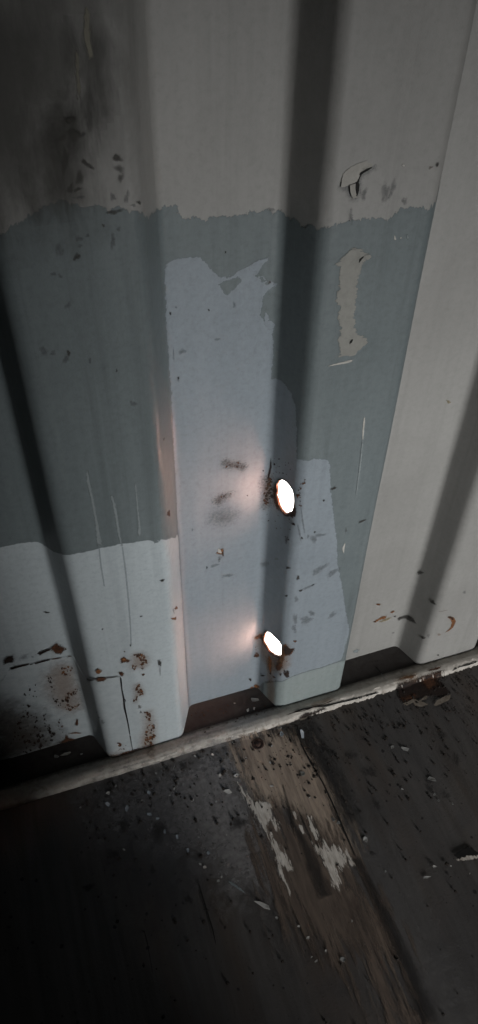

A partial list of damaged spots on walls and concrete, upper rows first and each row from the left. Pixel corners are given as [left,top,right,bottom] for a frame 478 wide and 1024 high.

peeling [341,161,372,199]
peeling [335,248,372,358]
corrosion [263,458,306,540]
corrosion [0,643,80,758]
crack [87,669,133,751]
corrosion [110,651,156,757]
corrosion [249,634,294,688]